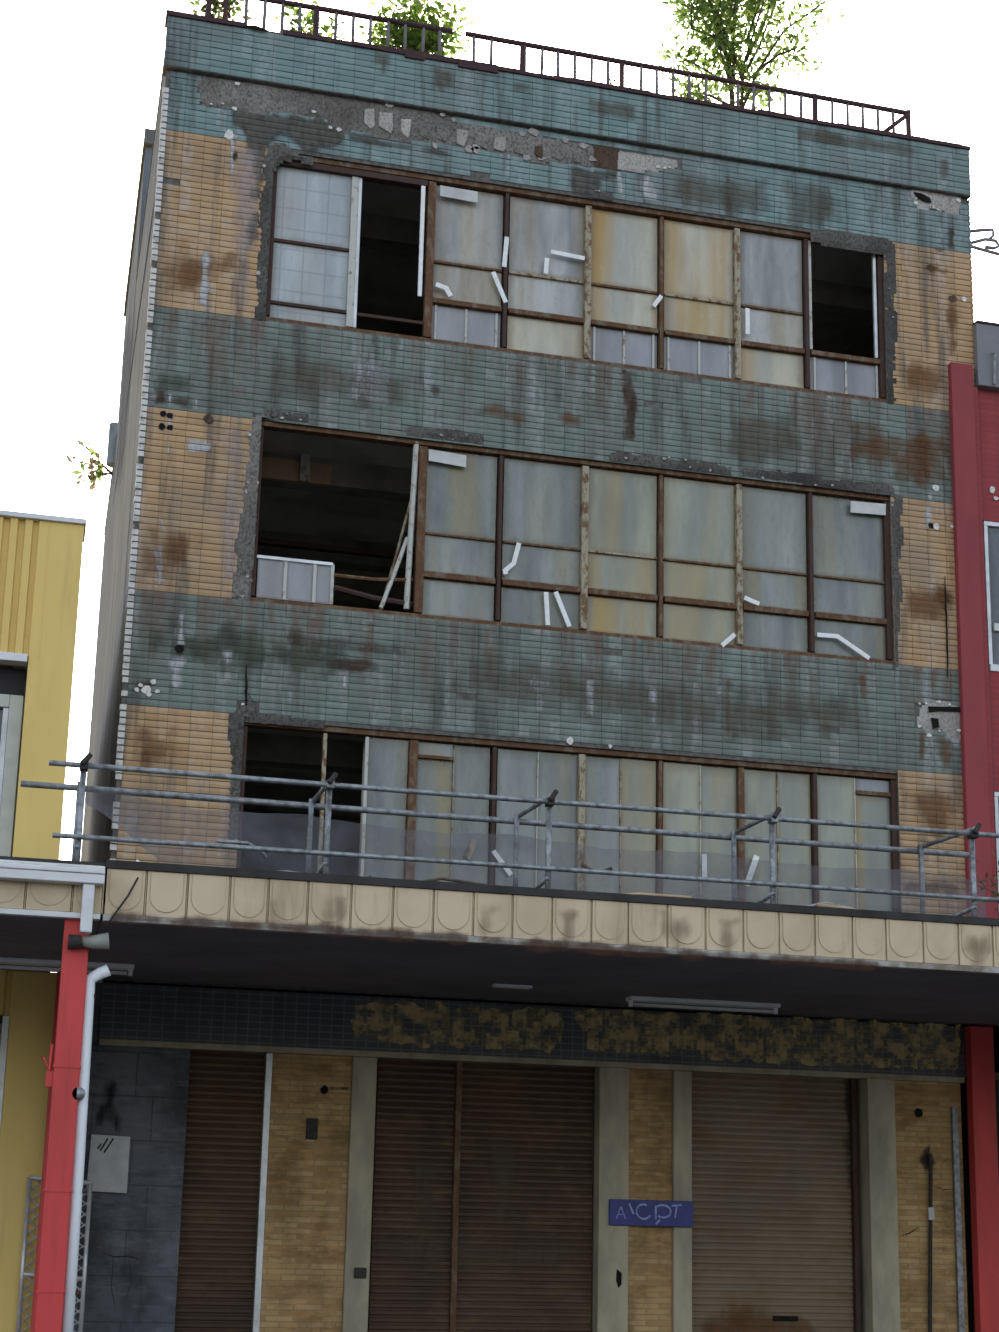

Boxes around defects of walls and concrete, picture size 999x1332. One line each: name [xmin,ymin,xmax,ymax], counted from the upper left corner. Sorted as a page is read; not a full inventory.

spalling [197,76,678,174]
spalling [908,189,961,215]
leakage [200,252,210,304]
leakage [169,614,185,687]
spalling [917,700,961,739]
leakage [105,697,120,836]